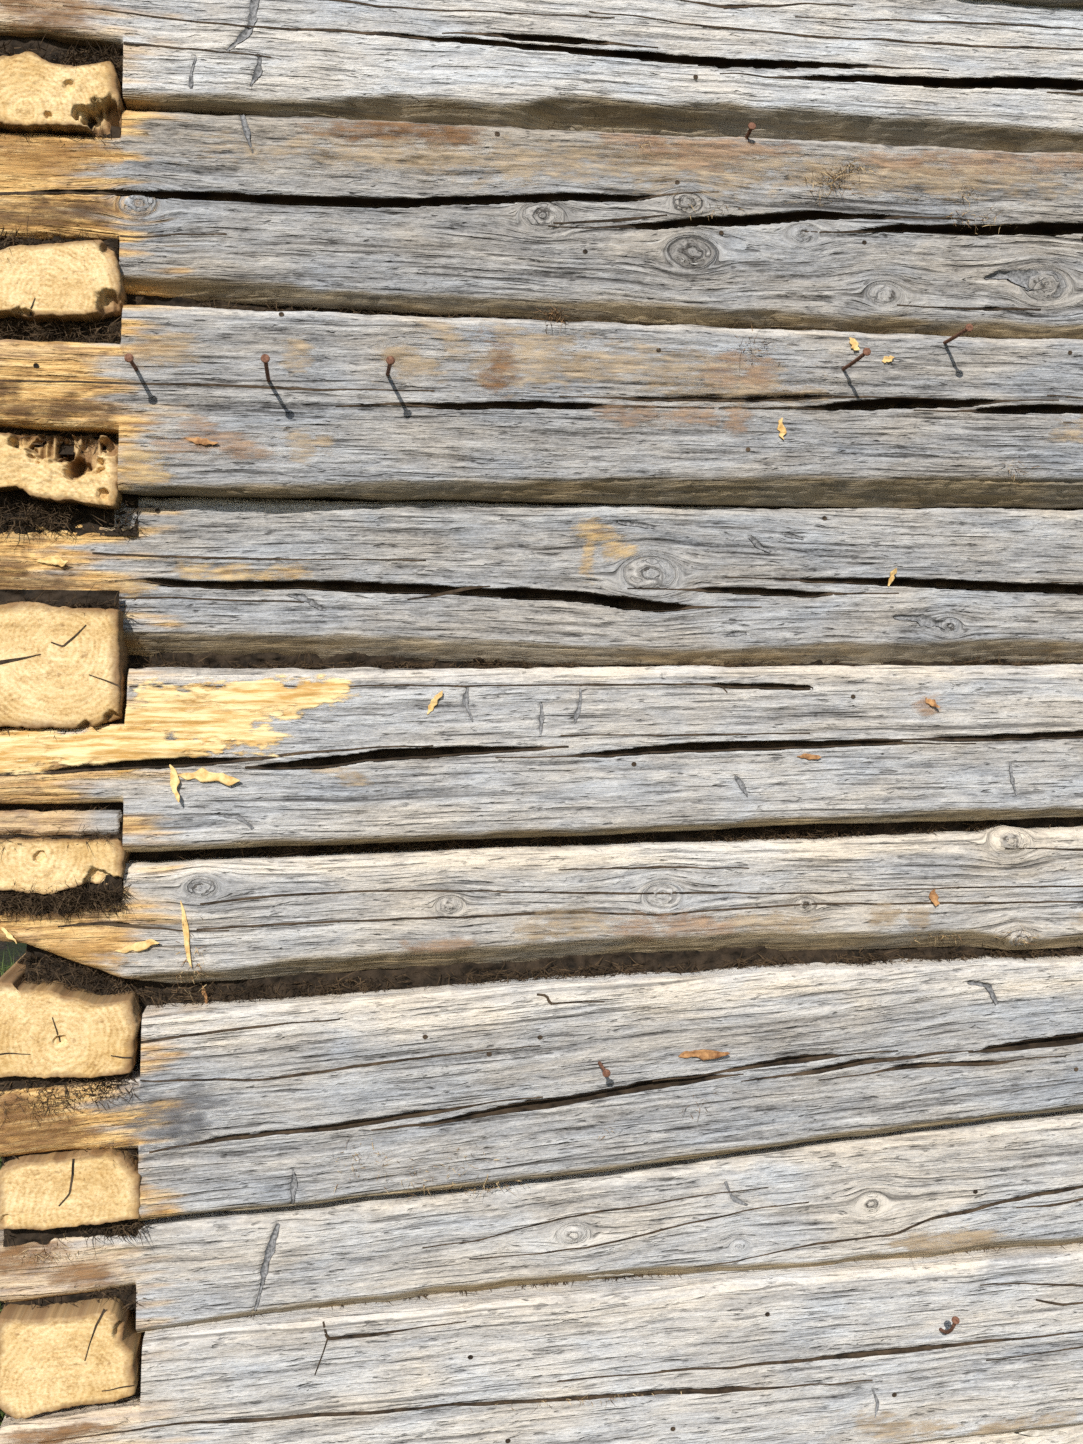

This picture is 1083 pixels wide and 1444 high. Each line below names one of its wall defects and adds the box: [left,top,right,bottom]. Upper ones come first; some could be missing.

crack [63,0,1083,96]
crack [0,189,1083,238]
crack [0,379,1083,424]
crack [92,552,1083,611]
crack [89,674,226,687]
crack [349,683,813,693]
spalling [0,674,352,775]
crack [0,731,1083,776]
crack [149,1032,1083,1154]